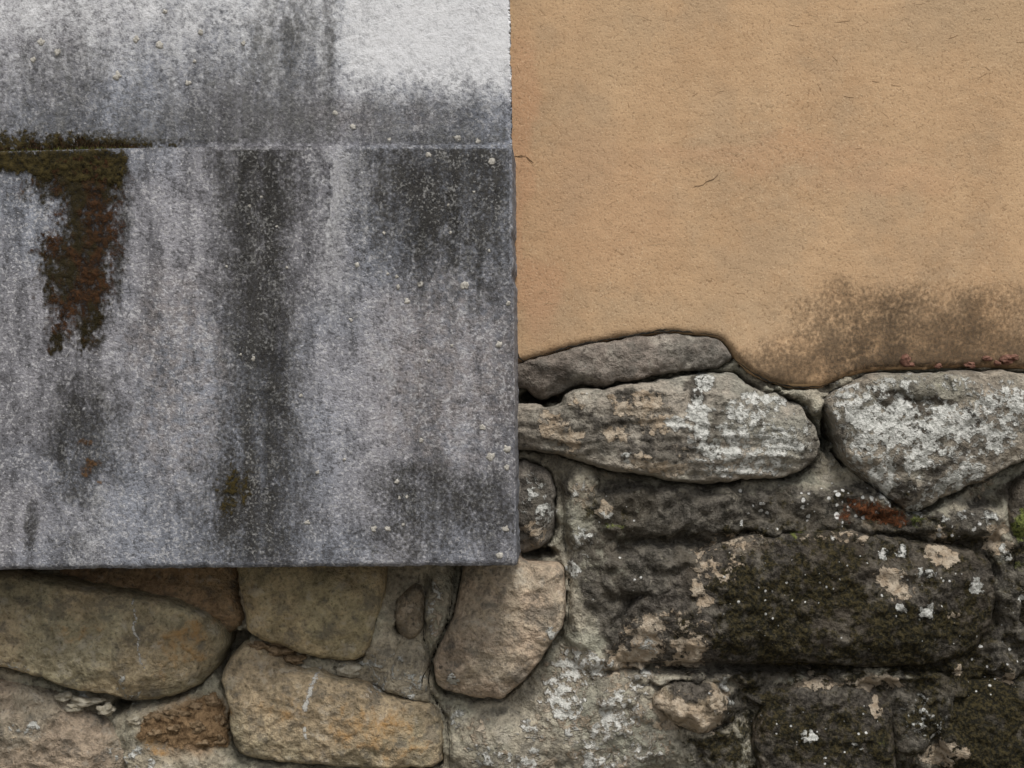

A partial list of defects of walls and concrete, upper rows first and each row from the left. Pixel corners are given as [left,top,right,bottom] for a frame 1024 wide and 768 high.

corrosion [0,149,131,356]
water stain [111,12,515,562]
water stain [45,376,127,507]